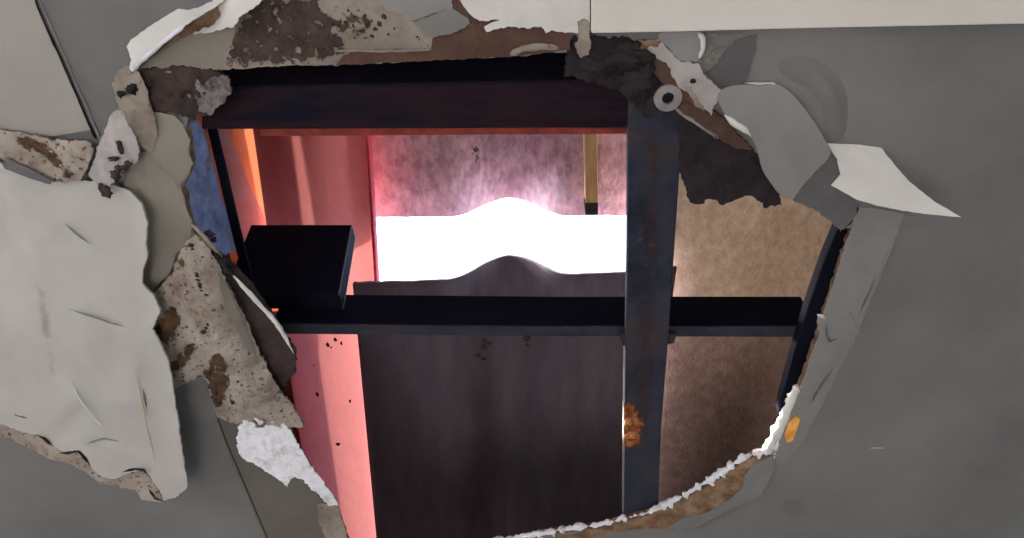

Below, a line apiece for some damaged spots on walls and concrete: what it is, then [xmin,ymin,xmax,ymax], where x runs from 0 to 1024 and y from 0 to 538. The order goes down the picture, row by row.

flaking render [220,0,592,70]
peeling [658,31,744,65]
damp [18,137,74,178]
peeling [718,82,960,228]
peeling [218,129,266,242]
damp [154,307,180,344]
damp [171,323,209,377]
damp [198,353,239,407]
rust [622,401,644,448]
flaking render [236,418,348,538]
spalling [493,384,800,538]